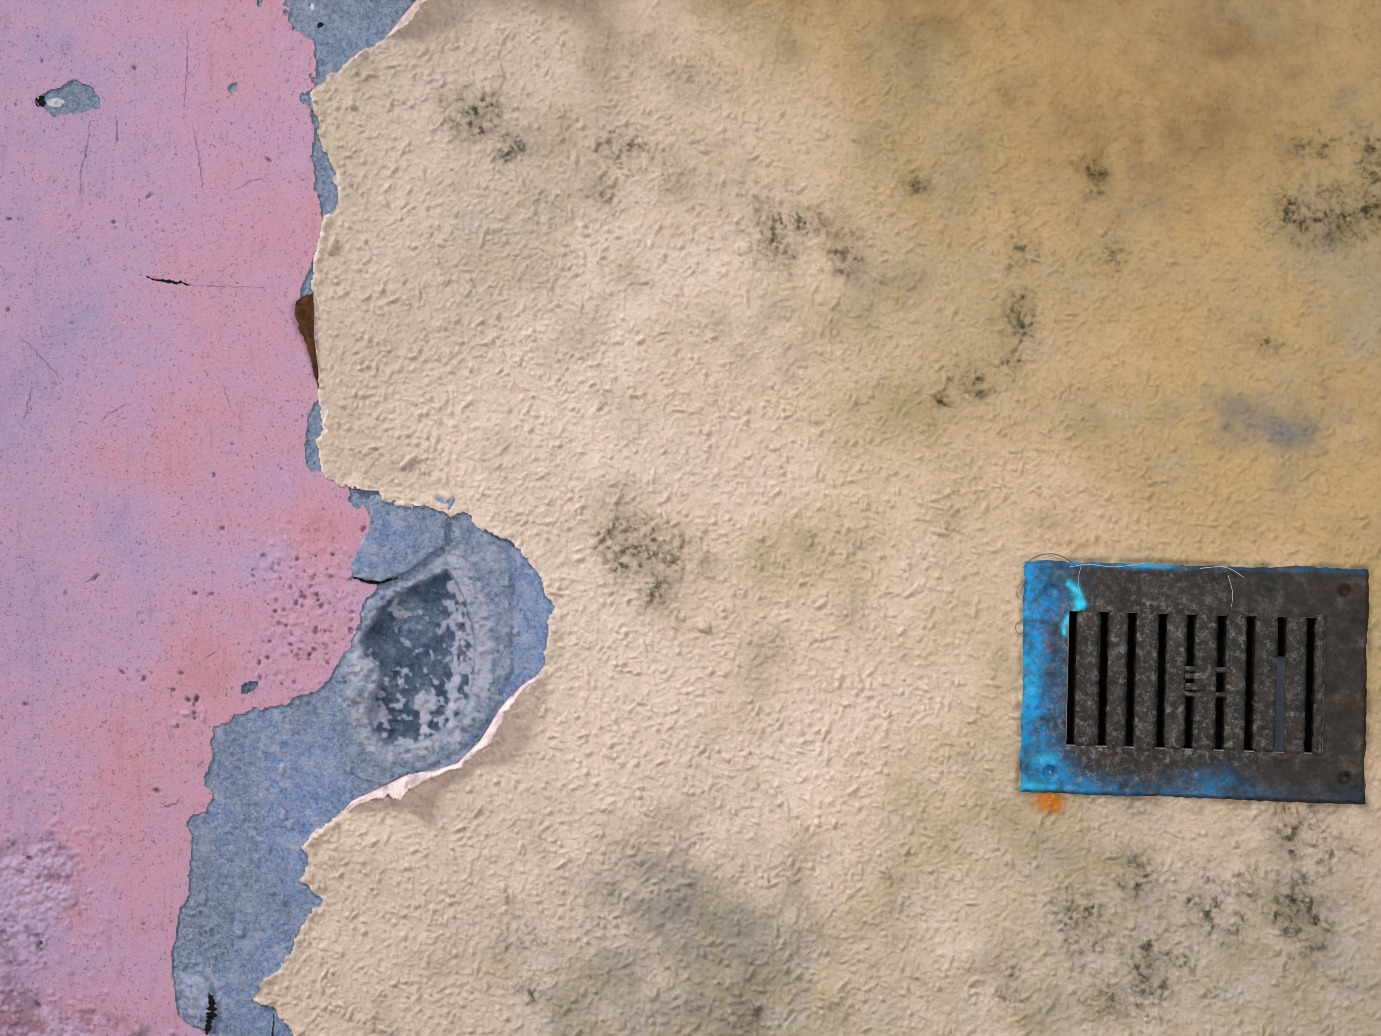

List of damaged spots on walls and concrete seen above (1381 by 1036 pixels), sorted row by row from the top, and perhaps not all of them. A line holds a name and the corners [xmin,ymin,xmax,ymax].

peeling [40,80,100,117]
peeling [283,0,491,218]
crack [146,276,264,288]
peeling [294,254,324,472]
crack [353,577,398,585]
peeling [171,486,555,1036]